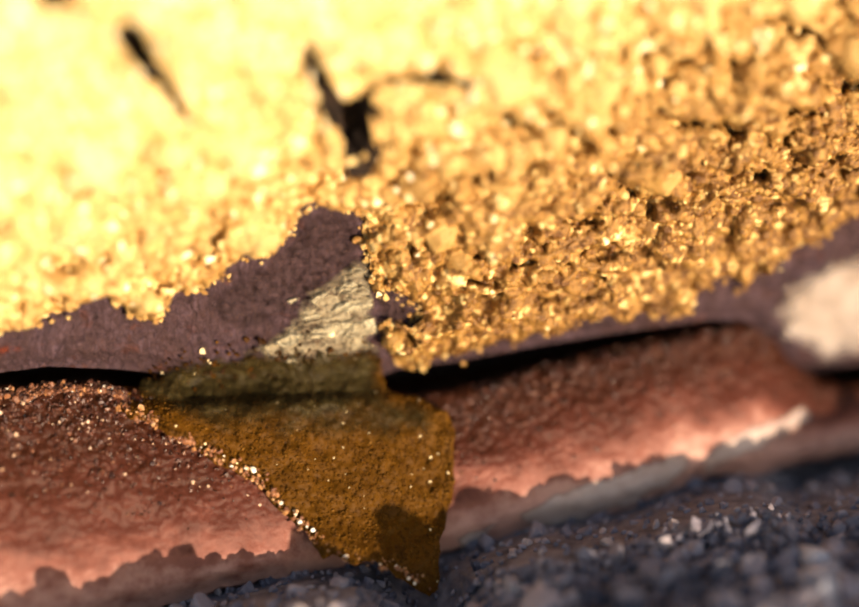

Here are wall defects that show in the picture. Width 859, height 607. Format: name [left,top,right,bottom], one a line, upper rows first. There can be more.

crack [112,10,194,123]
crack [301,41,471,178]
peeling [788,264,859,354]